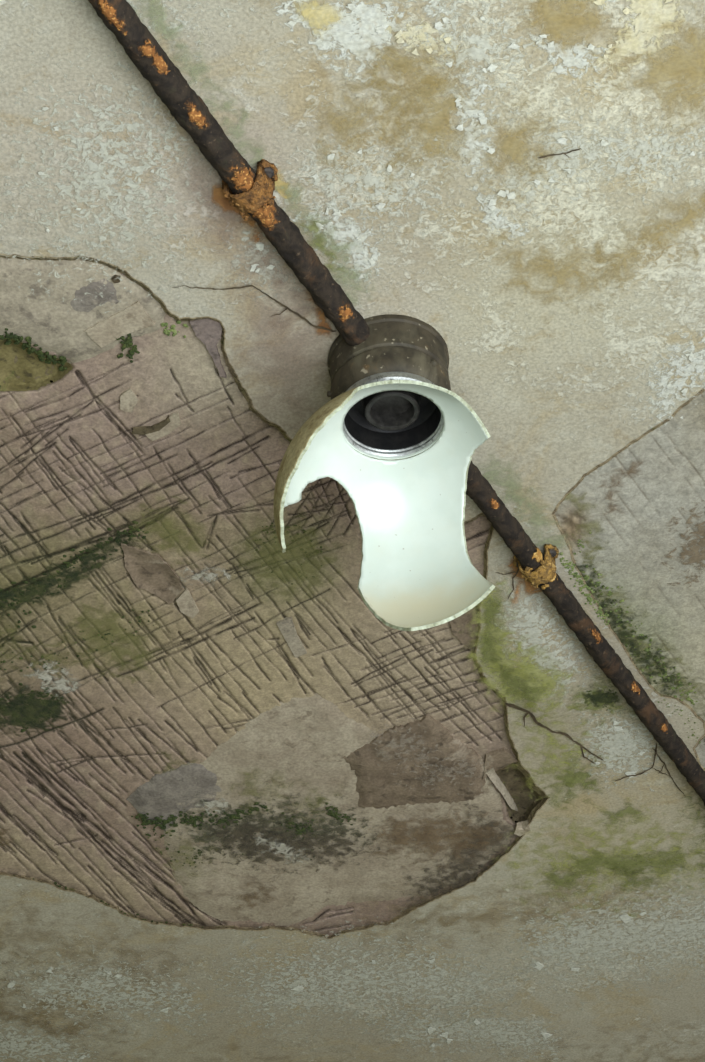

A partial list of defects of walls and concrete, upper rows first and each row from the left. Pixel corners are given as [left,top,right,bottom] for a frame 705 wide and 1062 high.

rust [98,0,128,35]
rust [139,39,170,75]
rust [188,103,207,128]
leakage [372,48,456,155]
leakage [642,29,705,110]
rust [213,163,291,242]
leakage [596,196,705,276]
crack [174,285,336,332]
flaking render [464,512,494,580]
flaking render [552,330,705,771]
peeling [488,574,602,711]
crack [505,703,685,795]